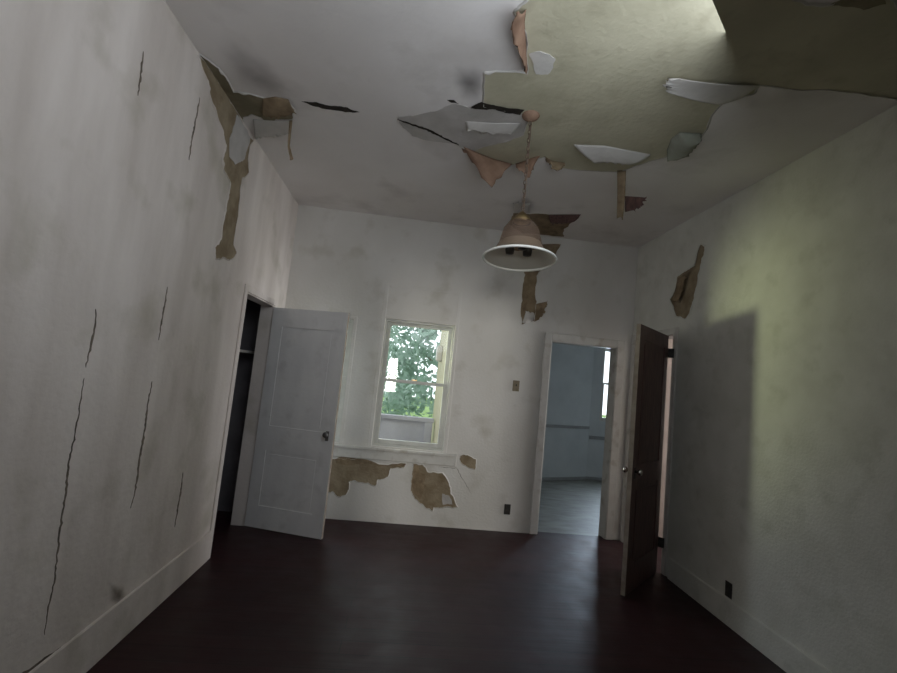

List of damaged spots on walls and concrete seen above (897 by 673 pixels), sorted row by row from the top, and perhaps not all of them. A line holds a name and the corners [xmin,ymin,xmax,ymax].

crack [137,51,145,95]
crack [189,97,200,159]
peeling [197,53,296,261]
crack [301,101,358,113]
peeling [397,0,897,220]
peeling [511,202,581,255]
crack [158,287,168,340]
peeling [520,270,547,325]
peeling [670,244,706,320]
crack [130,382,152,508]
crack [22,309,97,673]
flaking render [328,454,477,512]